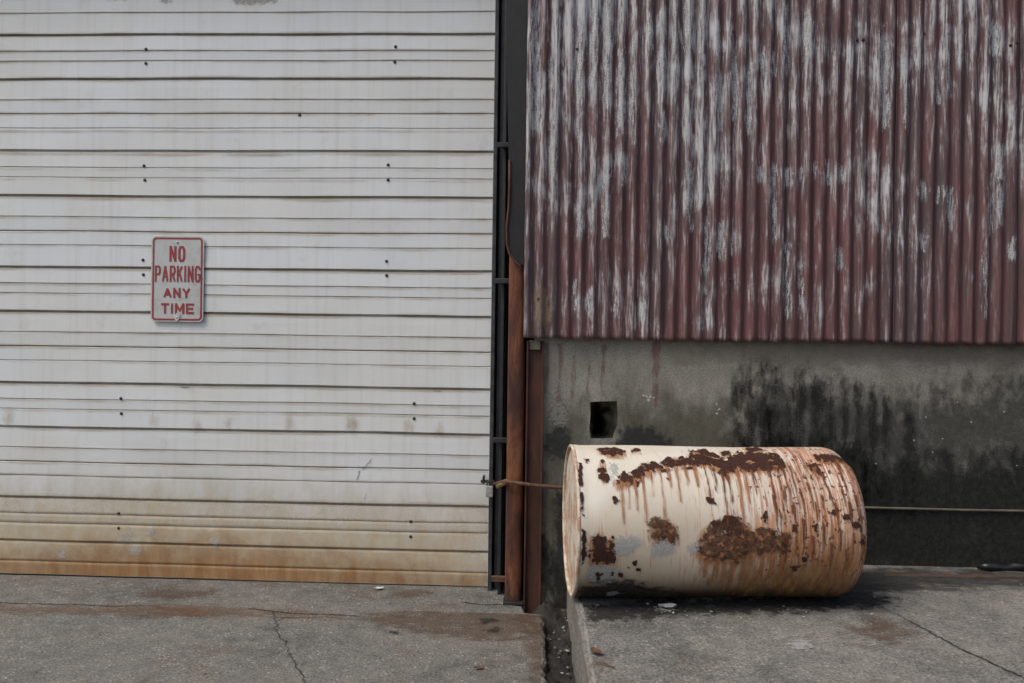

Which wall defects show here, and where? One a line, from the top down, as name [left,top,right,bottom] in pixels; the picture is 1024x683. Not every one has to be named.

corrosion [534,285,552,332]
corrosion [493,479,563,489]
damp [583,341,1024,621]
corrosion [0,499,483,586]
crack [248,607,367,683]